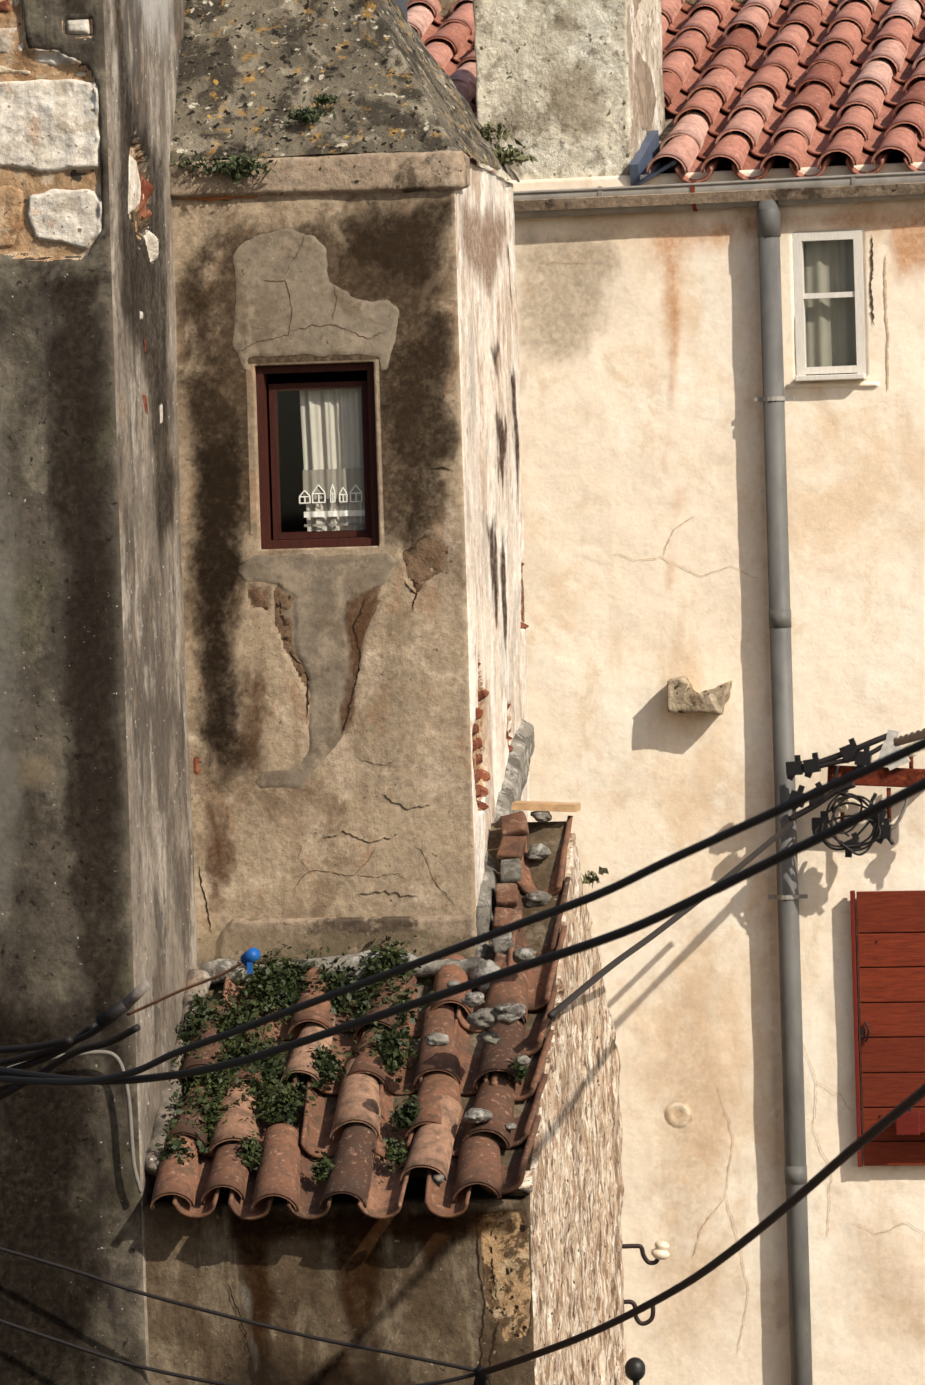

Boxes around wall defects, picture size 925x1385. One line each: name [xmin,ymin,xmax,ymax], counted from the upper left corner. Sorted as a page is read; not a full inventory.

flaking render [0,0,102,262]
leakage [116,0,265,782]
flaking render [403,536,449,593]
crack [618,516,756,578]
flaking render [247,587,310,702]
flaking render [472,655,490,814]
leakage [0,278,121,1385]
crack [298,846,455,905]
flaking render [481,1210,531,1342]